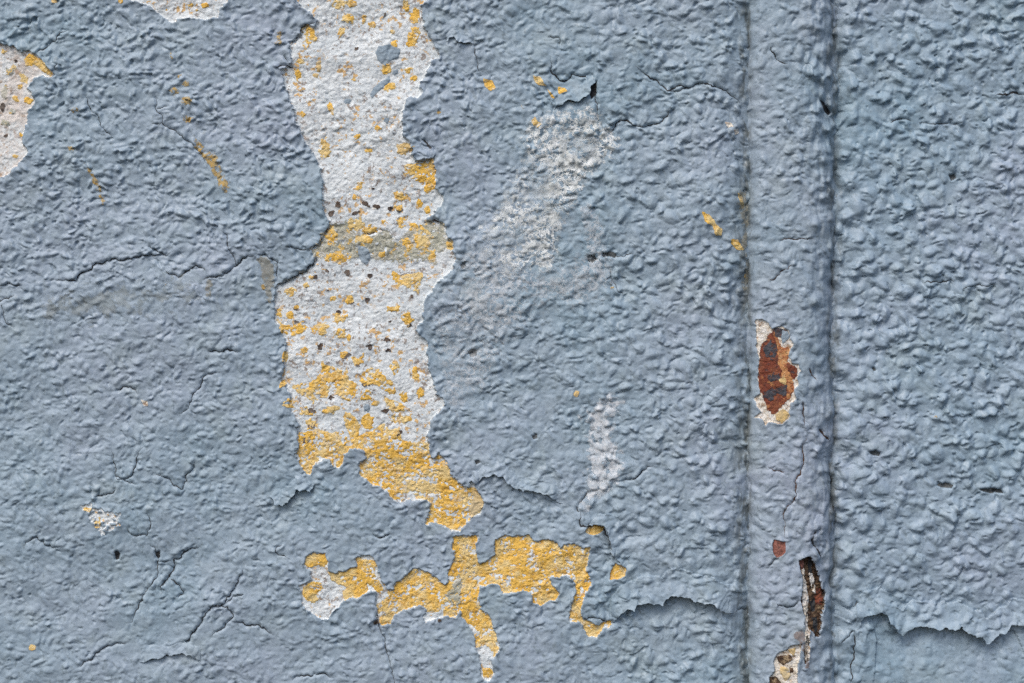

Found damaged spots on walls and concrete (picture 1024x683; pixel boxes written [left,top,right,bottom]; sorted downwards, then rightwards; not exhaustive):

peeling [118,0,228,23]
peeling [0,44,54,177]
crack [550,36,741,133]
crack [49,225,334,284]
peeling [261,0,734,682]
rust [754,319,801,426]
crack [768,403,829,568]
crack [76,516,200,668]
crack [185,563,272,642]
peeling [769,644,802,683]
rust [799,557,825,664]
peeling [856,586,1024,645]